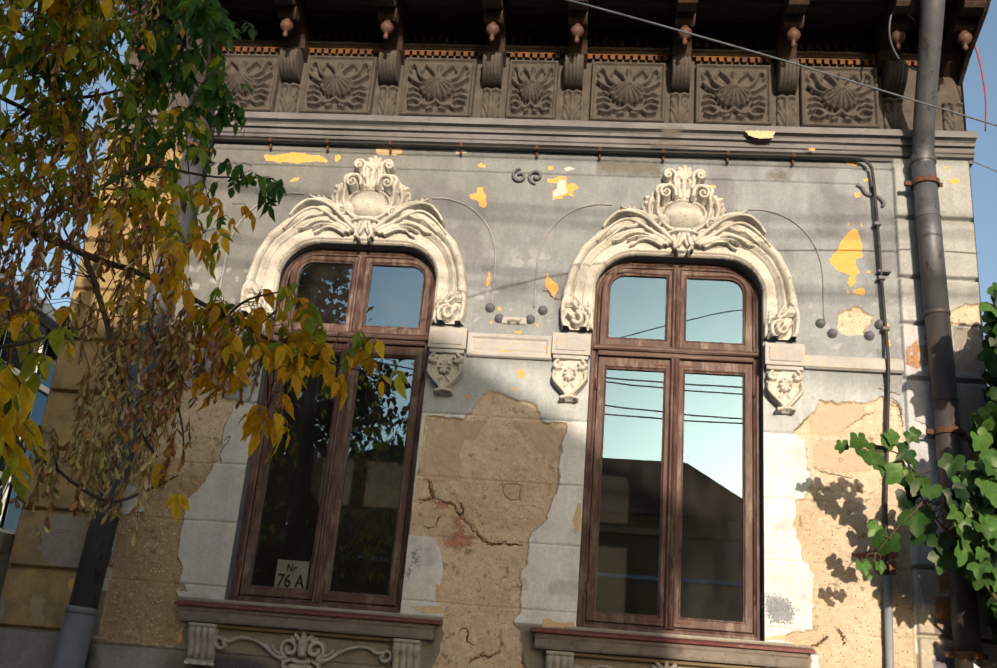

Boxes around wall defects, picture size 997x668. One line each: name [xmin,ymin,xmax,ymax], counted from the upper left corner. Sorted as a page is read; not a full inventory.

peeling [264,152,341,164]
peeling [469,187,487,208]
peeling [547,165,579,200]
peeling [746,130,775,139]
peeling [829,223,875,336]
flaking render [951,303,984,374]
flaking render [93,386,238,648]
crack [419,479,522,547]
flaking render [409,369,568,668]
flaking render [765,397,917,668]
crack [459,628,525,668]
peeling [542,619,575,628]